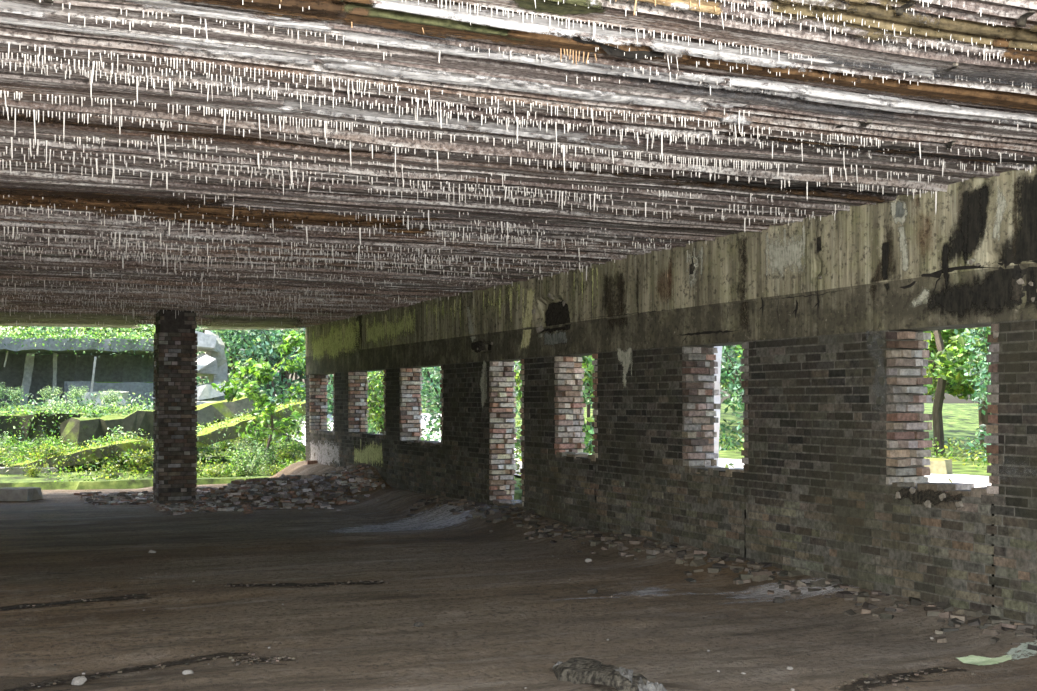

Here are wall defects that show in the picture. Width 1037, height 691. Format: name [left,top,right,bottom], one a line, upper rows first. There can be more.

spalling [895,0,915,15]
spalling [1016,9,1035,27]
leakage [0,0,1037,150]
leakage [0,188,227,205]
leakage [574,268,639,330]
leakage [686,247,703,286]
leakage [737,238,748,330]
leakage [766,225,805,277]
leakage [870,201,908,298]
leakage [877,148,1037,319]
crack [0,593,151,611]
crack [3,651,298,691]